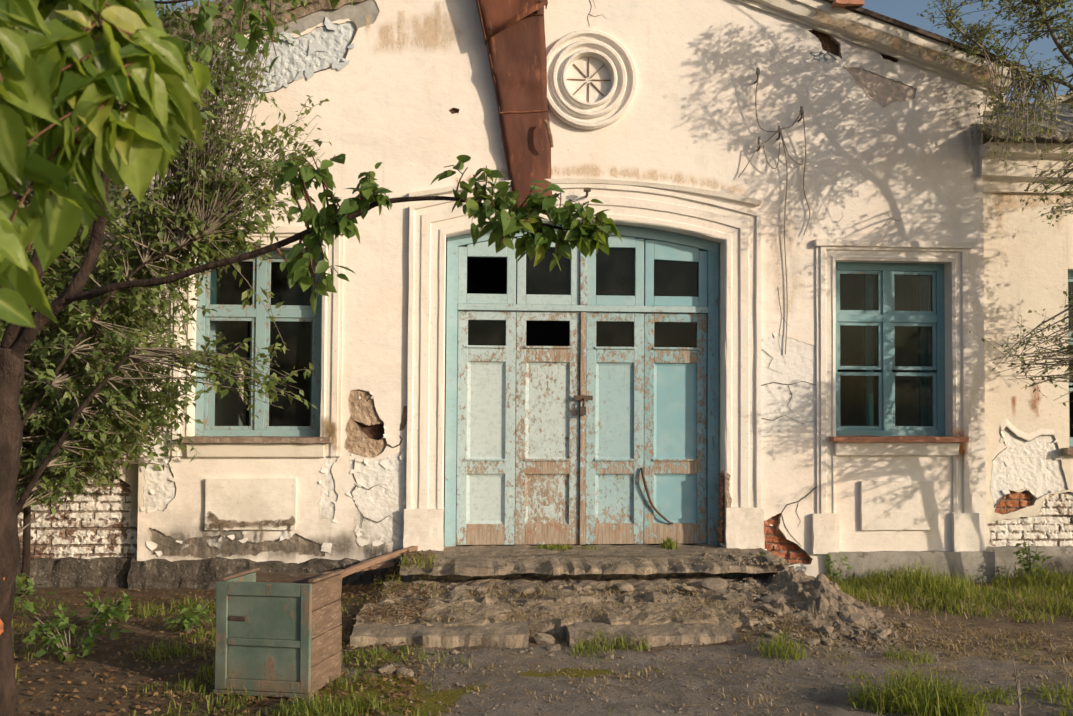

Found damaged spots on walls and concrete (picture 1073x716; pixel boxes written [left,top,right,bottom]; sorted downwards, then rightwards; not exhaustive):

flaking render [208,0,380,99]
flaking render [809,29,917,108]
crack [761,290,816,424]
flaking render [16,429,332,562]
peeling [319,389,408,547]
crack [351,459,399,527]
flaking render [717,470,732,545]
flaking render [764,513,813,565]
flaking render [987,490,1073,547]